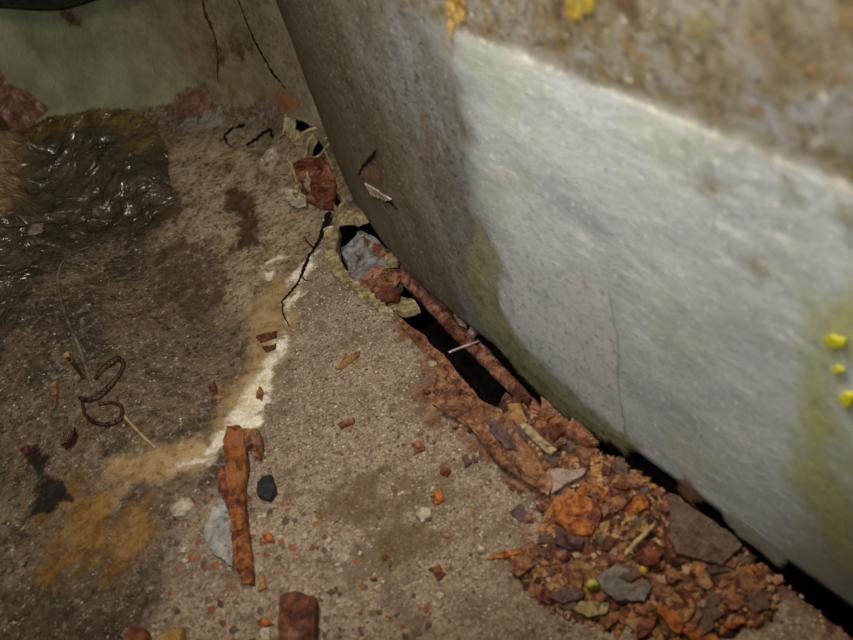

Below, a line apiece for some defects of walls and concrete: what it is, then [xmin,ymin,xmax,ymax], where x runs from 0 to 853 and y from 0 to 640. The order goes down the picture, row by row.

crack [202,0,219,80]
crack [238,0,286,89]
spalling [260,146,279,162]
spalling [282,113,394,316]
crack [358,149,397,209]
crack [278,211,332,325]
rust [374,287,401,305]
spalling [385,252,400,268]
damp [27,251,319,592]
rust [216,425,263,586]
rust [413,344,703,618]
rust [257,617,274,628]